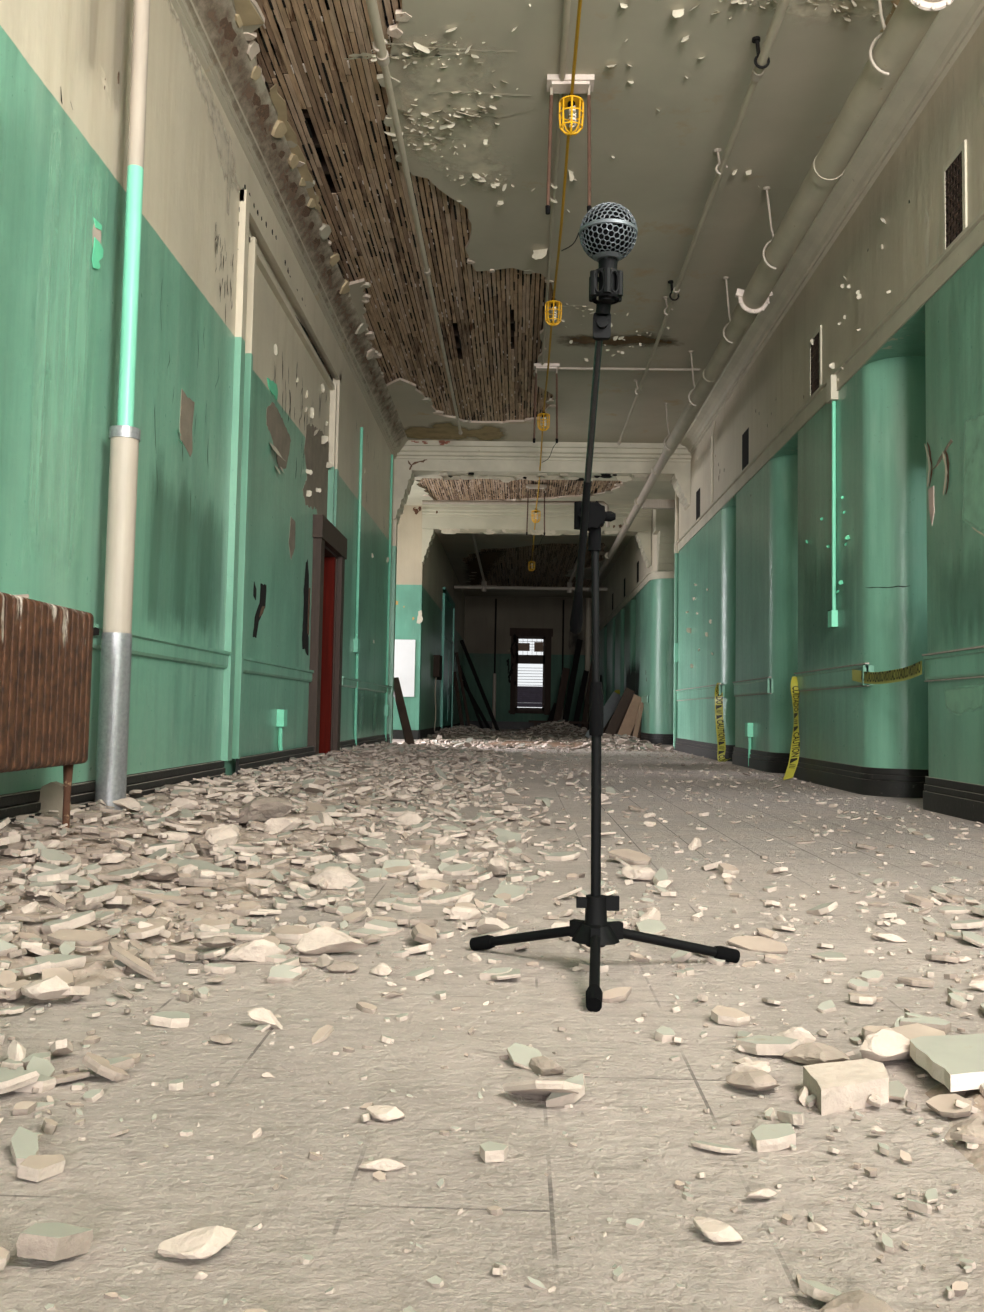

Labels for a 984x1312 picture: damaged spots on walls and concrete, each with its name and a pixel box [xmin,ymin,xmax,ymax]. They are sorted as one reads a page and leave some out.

peeling [714,0,900,32]
peeling [92,218,104,269]
spalling [196,0,675,445]
peeling [178,389,195,457]
peeling [266,378,332,518]
spalling [413,473,649,591]